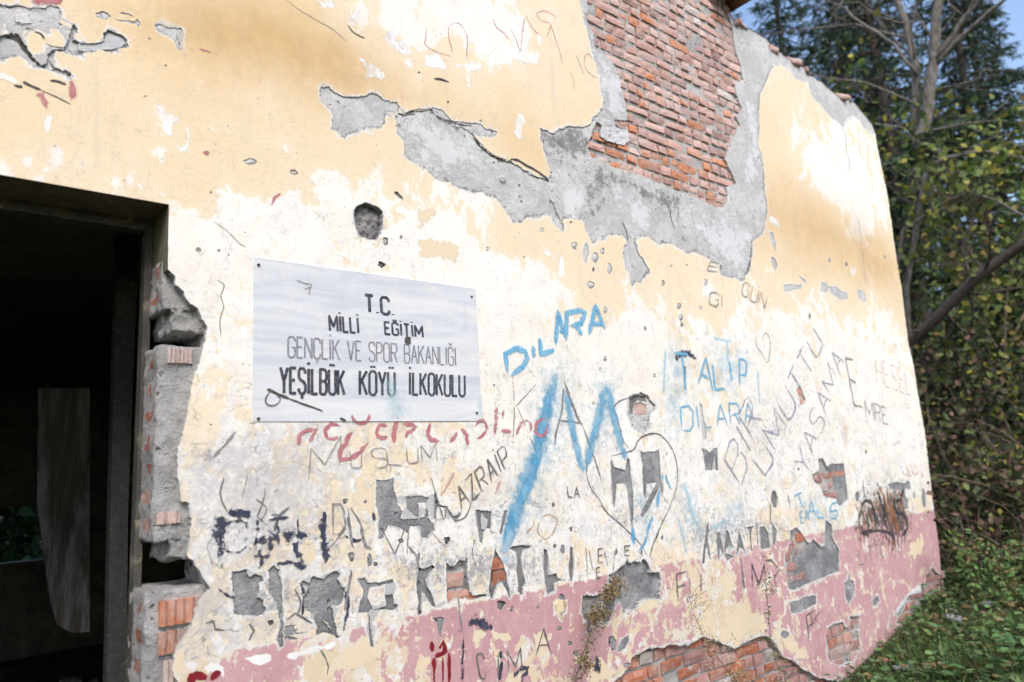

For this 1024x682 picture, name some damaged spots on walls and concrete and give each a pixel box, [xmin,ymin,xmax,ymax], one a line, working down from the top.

spalling [0,4,141,75]
crack [399,109,549,182]
flaking render [319,0,875,289]
spalling [812,458,860,506]
peeling [173,652,186,676]
spalling [231,538,384,679]
peeling [374,594,398,610]
flaking render [446,560,477,602]
flaking render [491,557,506,587]
flaking render [568,548,837,682]
spalling [785,520,855,613]
flaking render [825,615,860,665]